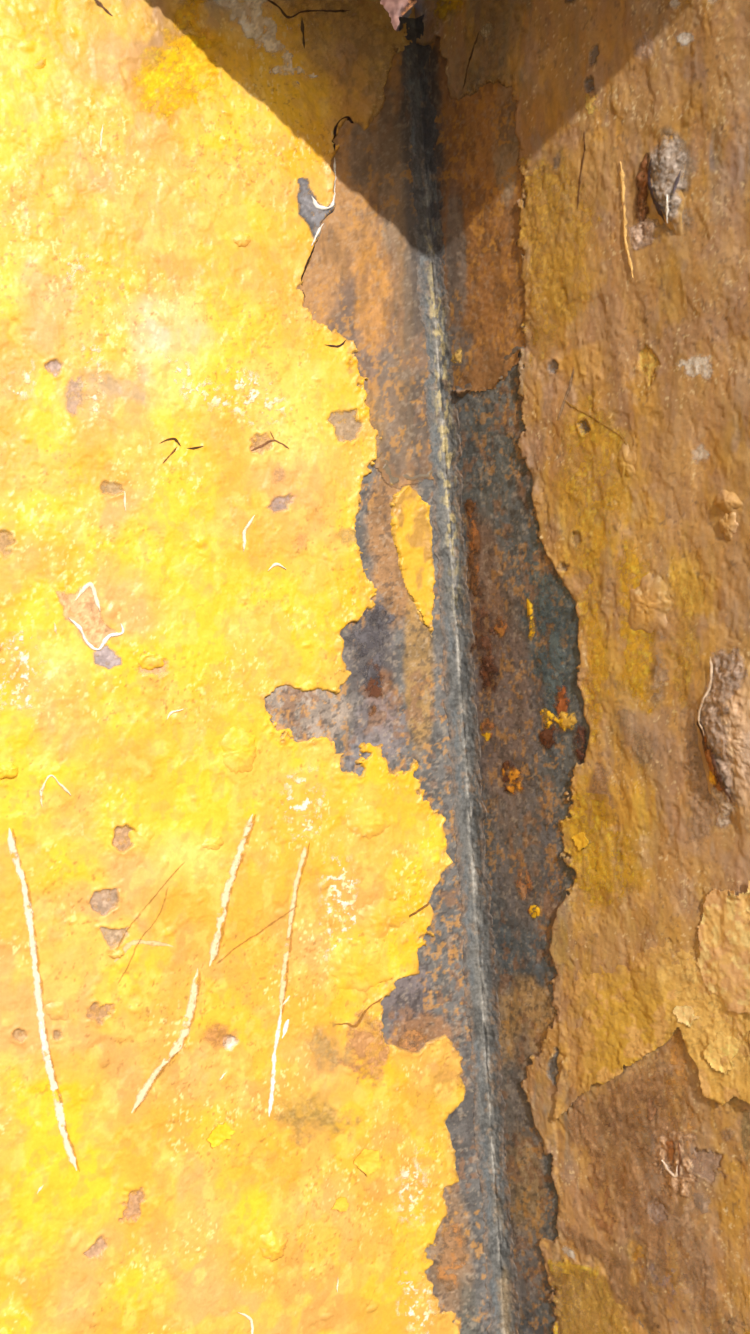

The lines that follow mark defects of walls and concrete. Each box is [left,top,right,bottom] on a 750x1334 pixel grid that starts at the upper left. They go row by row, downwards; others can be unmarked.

spalling [677,33,693,45]
peeling [264,50,491,1334]
peeling [428,38,750,1334]
corrosion [339,1013,389,1079]
corrosion [568,1034,713,1313]